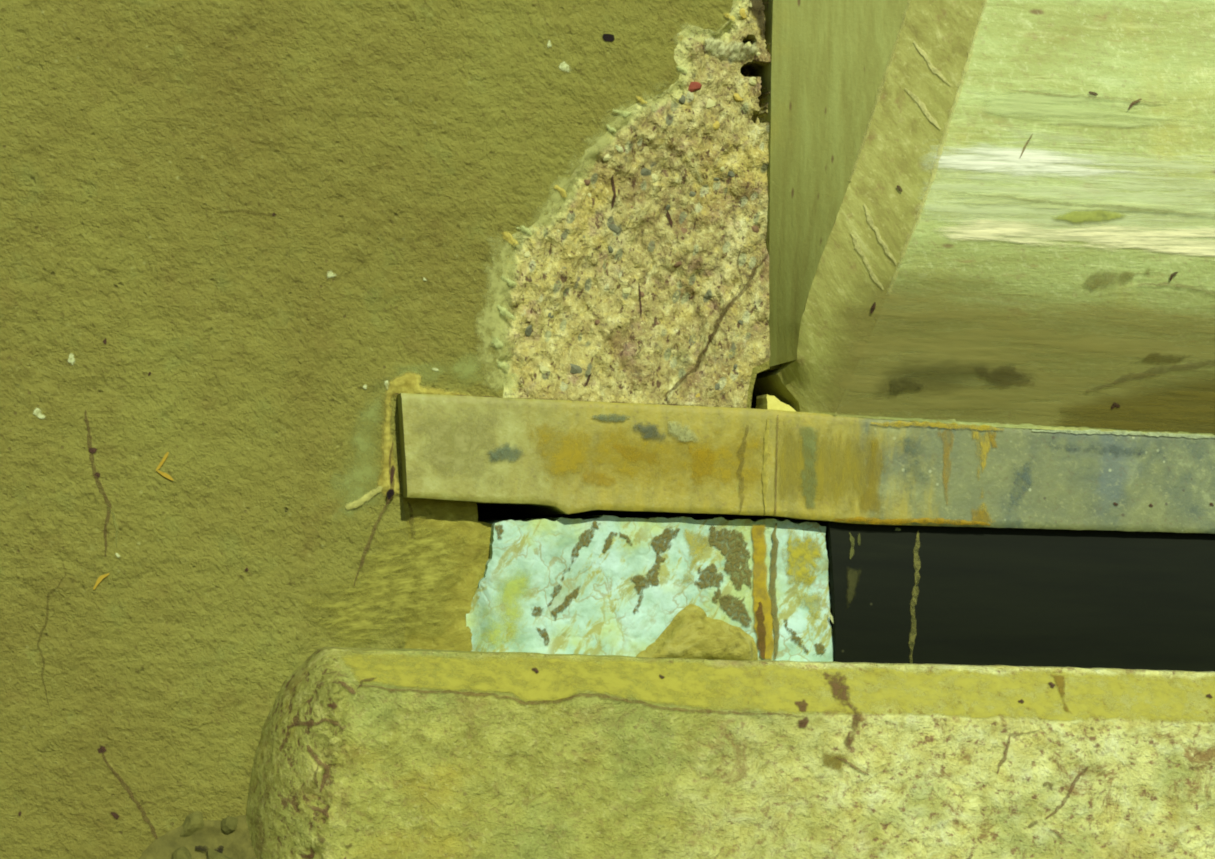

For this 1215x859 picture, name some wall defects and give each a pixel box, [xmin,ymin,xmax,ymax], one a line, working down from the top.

spalling [477,0,796,412]
water stain [831,288,1215,435]
crack [85,413,118,550]
rust [835,503,991,526]
rust [871,420,999,487]
peeling [532,521,633,645]
peeling [631,527,680,613]
peeling [695,526,752,627]
peeling [785,619,826,655]
crack [98,746,157,838]